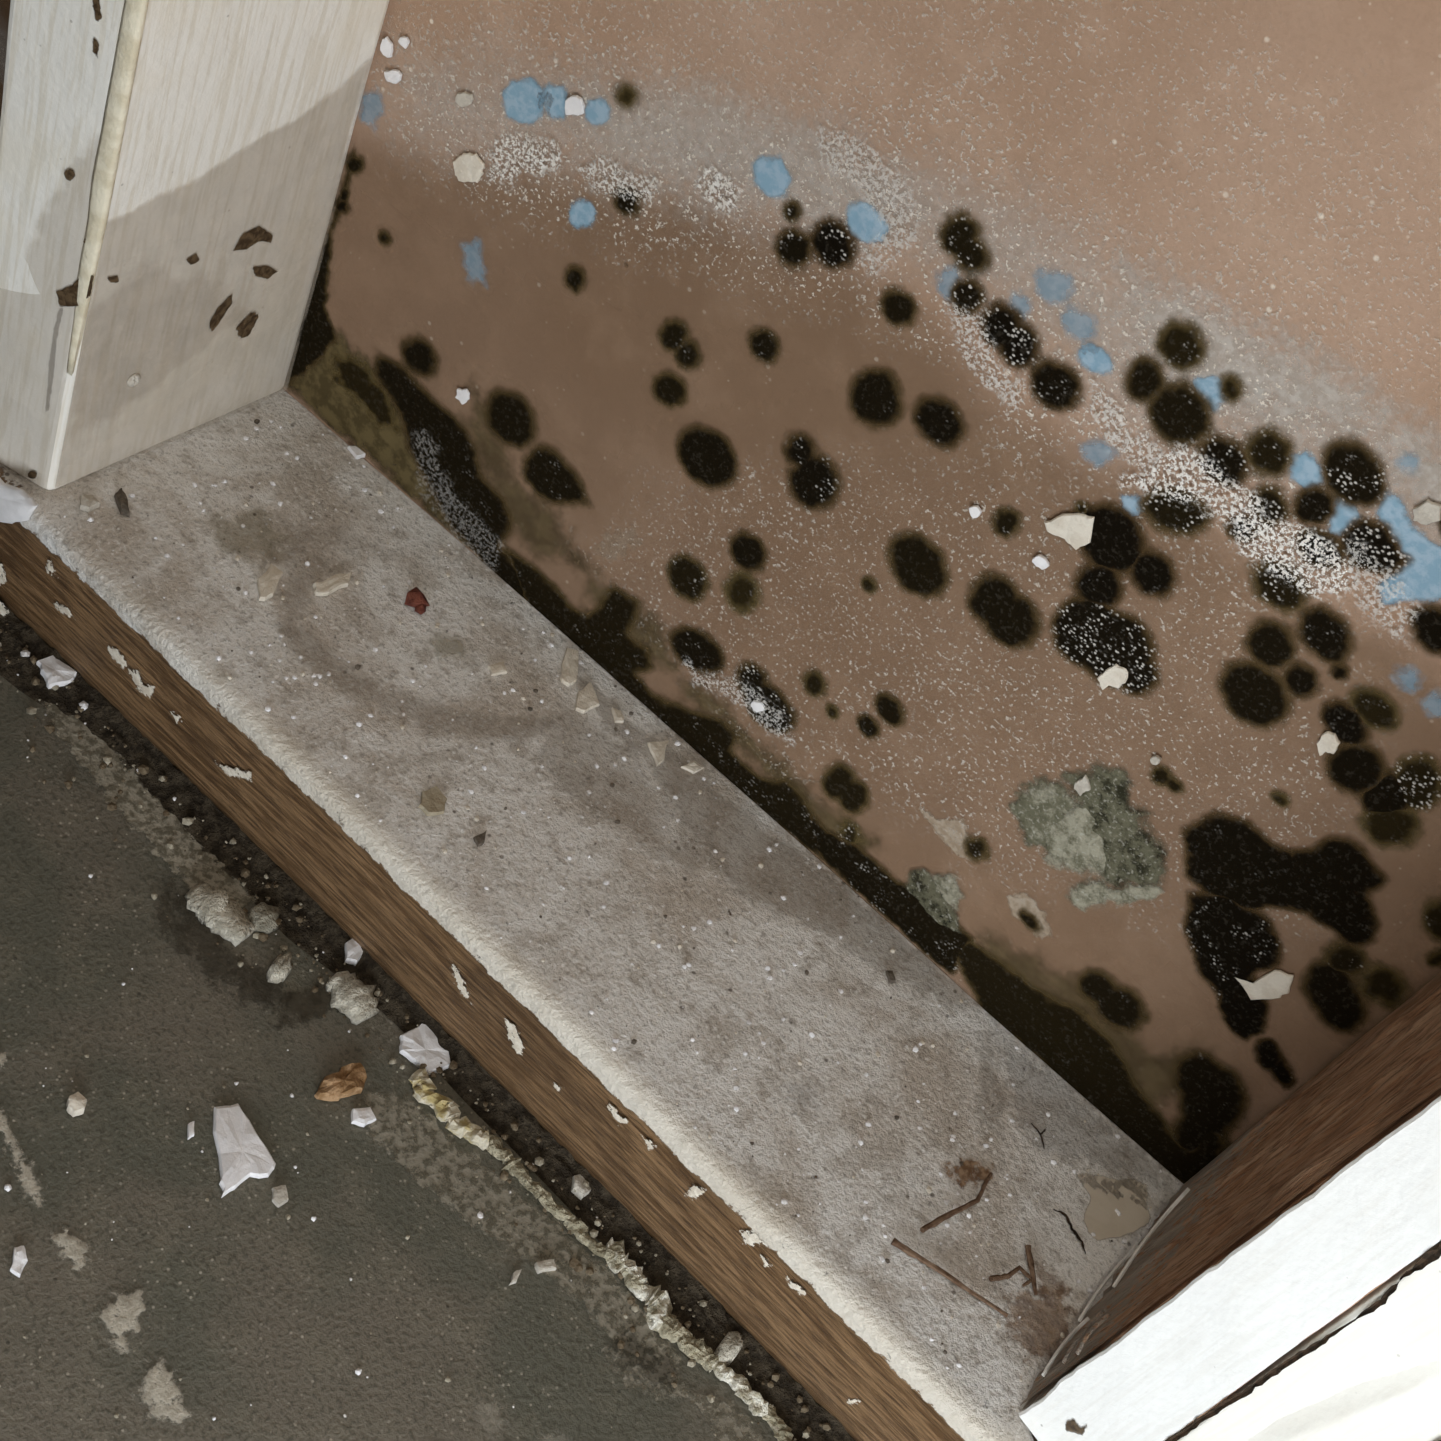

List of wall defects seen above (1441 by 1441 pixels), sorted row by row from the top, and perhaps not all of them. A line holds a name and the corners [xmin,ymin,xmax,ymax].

water stain [374,5,1441,848]
peeling [1413,499,1441,525]
water stain [284,151,1249,1184]
peeling [1074,775,1091,796]
water stain [1422,899,1441,967]
water stain [1300,940,1411,1034]
water stain [1254,1038,1297,1089]
crack [1031,1123,1046,1149]
crack [1053,1209,1086,1254]
crack [1166,1243,1441,1441]